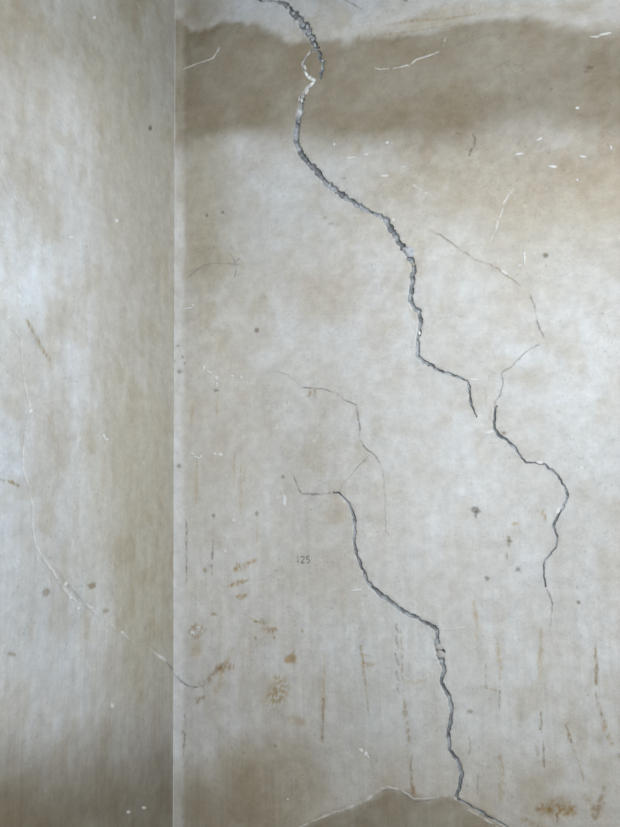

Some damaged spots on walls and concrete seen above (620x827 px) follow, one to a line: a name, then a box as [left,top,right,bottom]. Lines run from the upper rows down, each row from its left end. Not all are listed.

crack [182,45,221,71]
water stain [175,0,620,311]
crack [254,0,571,627]
crack [275,369,510,827]